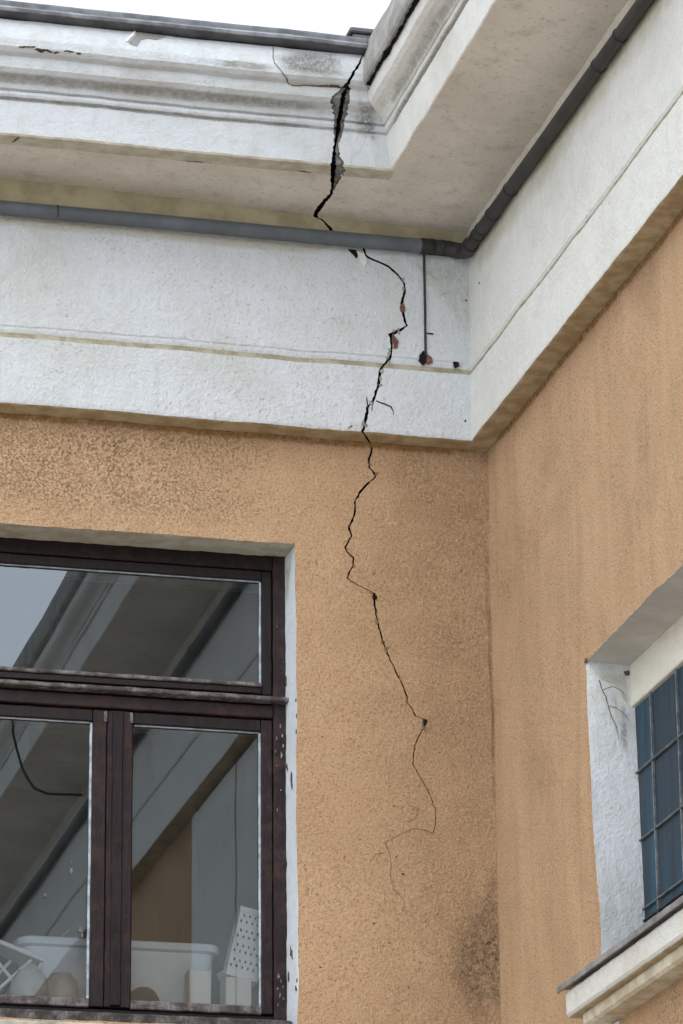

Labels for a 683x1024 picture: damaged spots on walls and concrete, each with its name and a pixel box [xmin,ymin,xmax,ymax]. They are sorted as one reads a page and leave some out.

crack [273,0,436,907]
crack [599,680,629,738]